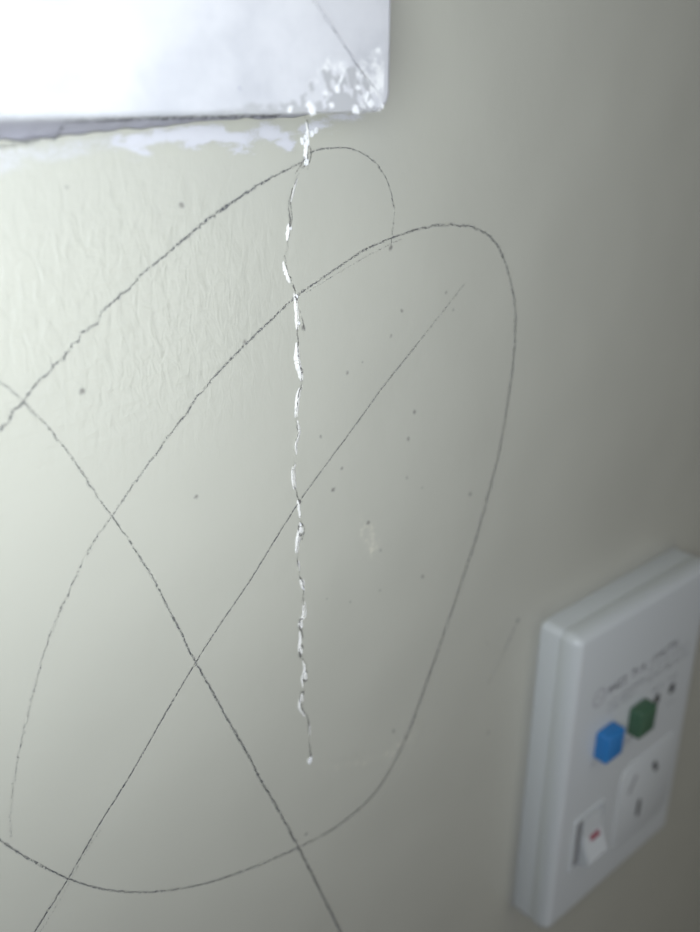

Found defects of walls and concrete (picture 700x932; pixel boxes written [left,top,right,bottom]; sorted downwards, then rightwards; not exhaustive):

crack [282,115,318,765]